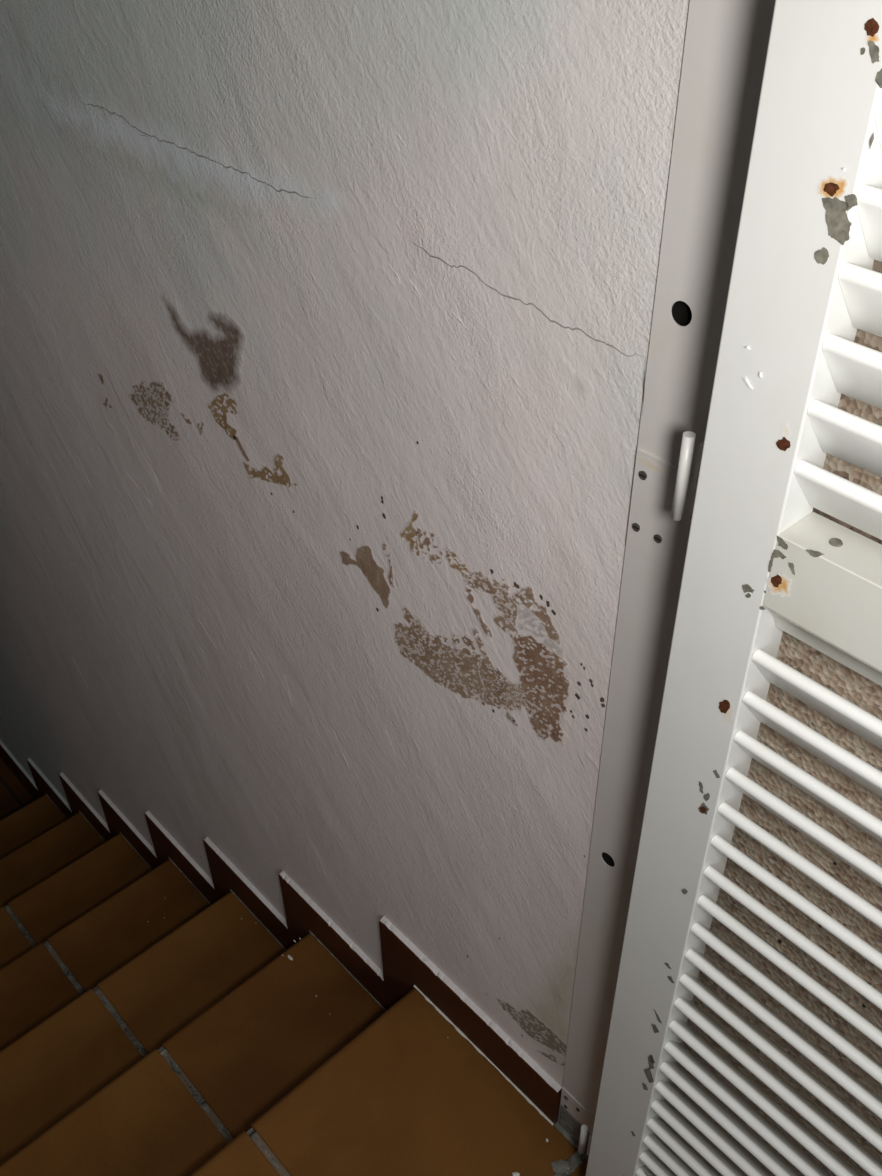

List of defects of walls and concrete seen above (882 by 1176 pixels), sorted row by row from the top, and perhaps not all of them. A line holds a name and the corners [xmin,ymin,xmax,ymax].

crack [83,102,315,199]
water stain [160,293,246,398]
crack [407,239,646,412]
peeling [128,380,298,495]
peeling [339,510,605,746]
peeling [486,994,567,1067]